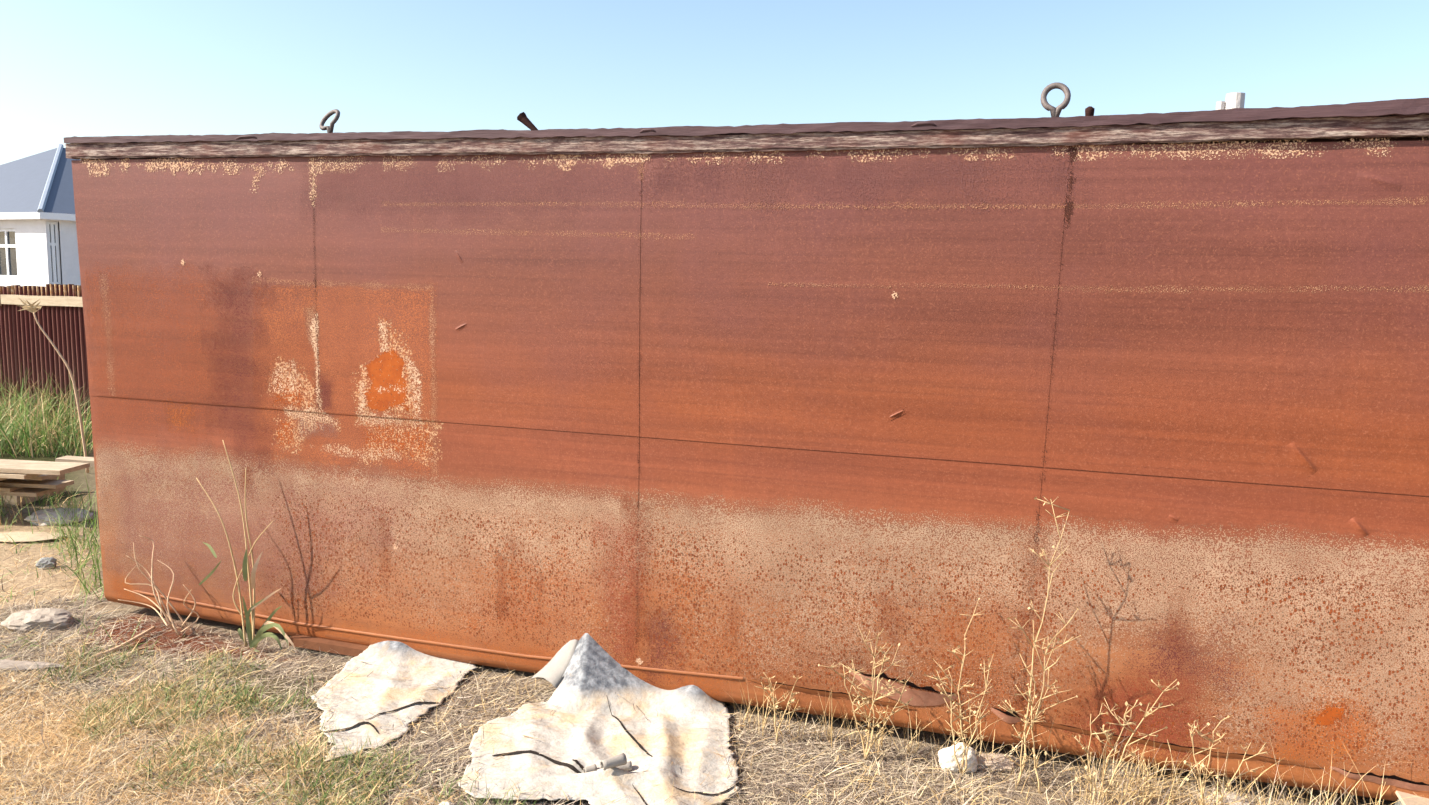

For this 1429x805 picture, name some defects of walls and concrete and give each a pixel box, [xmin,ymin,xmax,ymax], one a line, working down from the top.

peeling [80,156,417,193]
peeling [436,150,785,172]
peeling [807,138,1397,162]
peeling [266,317,444,467]
rust [901,536,1232,766]
rust [1256,697,1382,777]